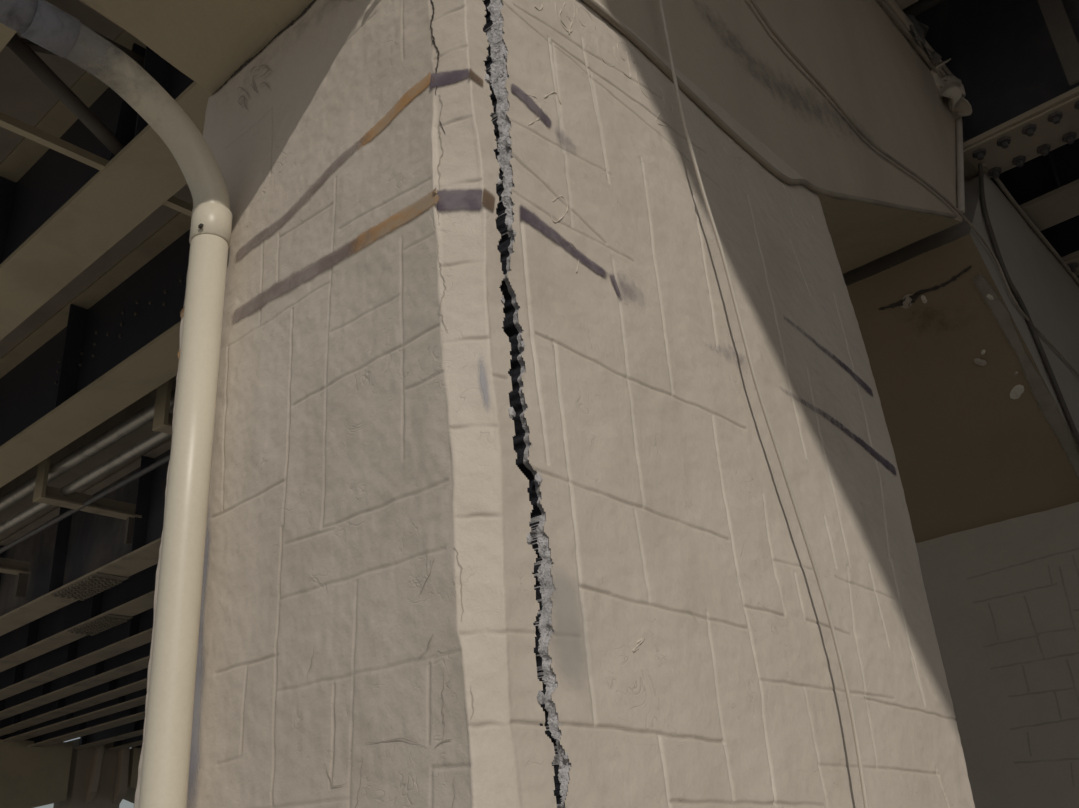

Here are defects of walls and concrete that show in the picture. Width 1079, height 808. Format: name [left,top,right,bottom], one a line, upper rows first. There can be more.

crack [212,0,316,95]
crack [430,0,448,331]
crack [482,0,571,808]
crack [879,266,972,310]